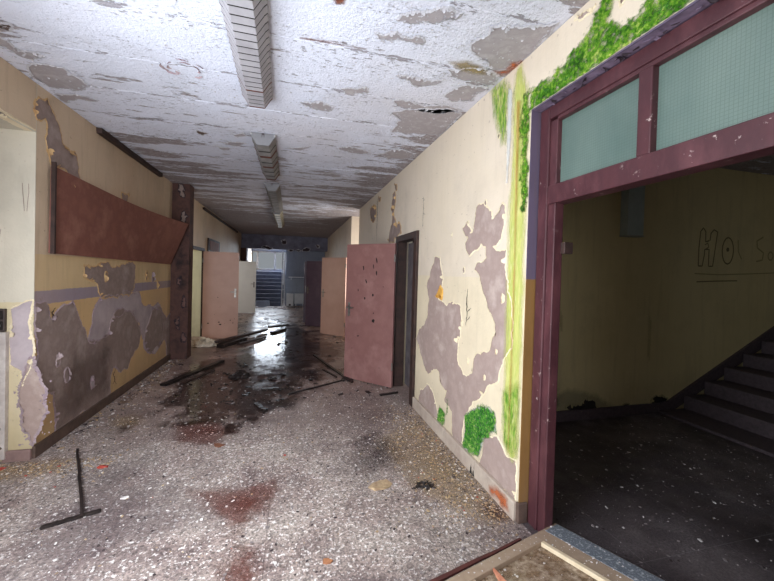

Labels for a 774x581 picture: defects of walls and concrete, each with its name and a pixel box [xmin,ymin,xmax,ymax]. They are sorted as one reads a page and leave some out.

peeling [374,4,466,45]
peeling [0,17,107,188]
peeling [300,97,340,112]
peeling [340,86,369,98]
peeling [388,18,559,137]
peeling [196,130,247,152]
peeling [337,145,417,161]
peeling [388,183,402,243]
peeling [416,199,514,445]
peeling [9,261,171,447]
peeling [479,435,518,500]